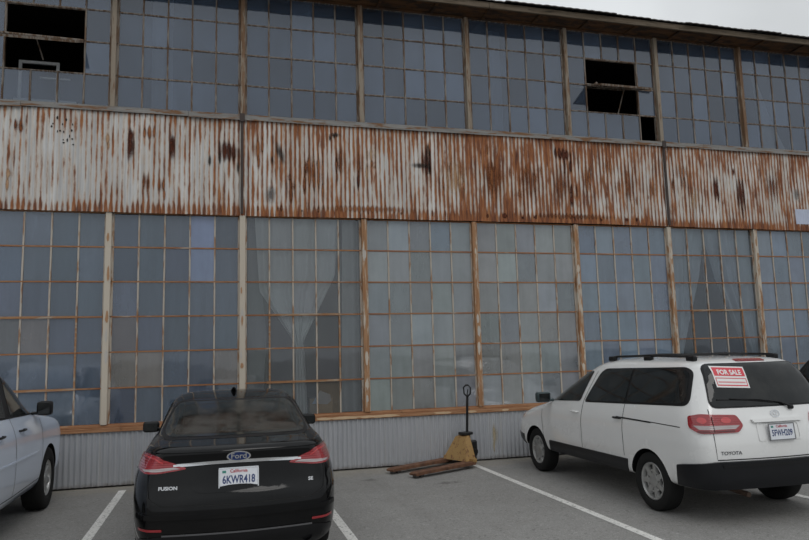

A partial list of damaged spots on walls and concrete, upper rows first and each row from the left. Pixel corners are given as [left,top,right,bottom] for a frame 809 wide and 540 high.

corrosion [143,175,166,200]
corrosion [208,142,239,171]
corrosion [286,155,412,215]
corrosion [357,148,376,190]
corrosion [422,146,431,175]
corrosion [479,164,511,218]
corrosion [518,167,542,219]
corrosion [534,148,608,221]
corrosion [602,159,638,221]
corrosion [672,164,703,216]
corrosion [732,169,746,219]